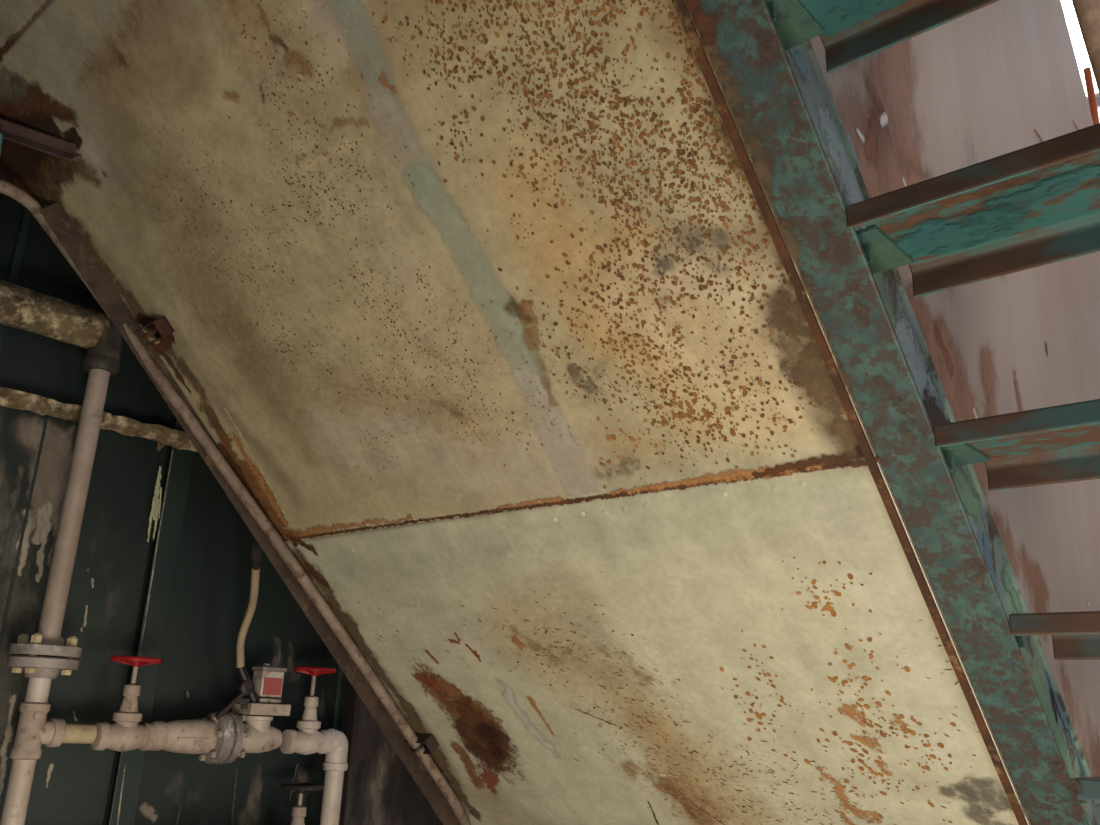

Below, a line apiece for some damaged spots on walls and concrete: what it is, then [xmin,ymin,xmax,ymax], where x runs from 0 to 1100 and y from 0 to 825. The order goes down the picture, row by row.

rust [0,118,82,162]
rust [67,0,881,556]
water stain [0,418,74,795]
peeling [140,452,173,651]
rust [782,557,873,617]
rust [994,512,1048,613]
rust [412,591,960,825]